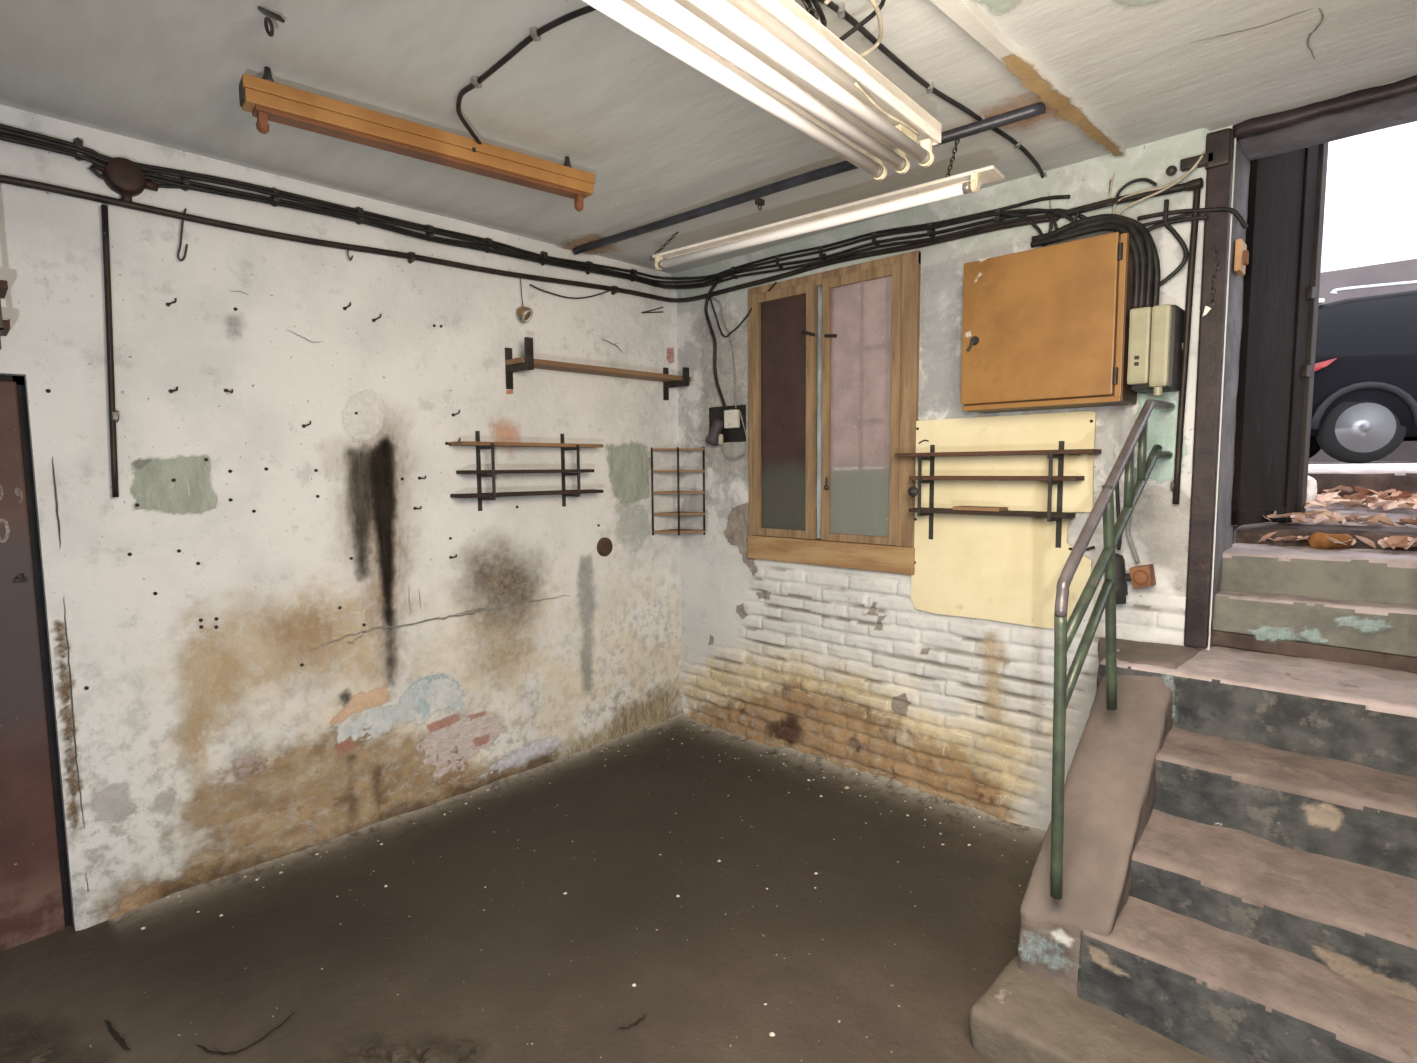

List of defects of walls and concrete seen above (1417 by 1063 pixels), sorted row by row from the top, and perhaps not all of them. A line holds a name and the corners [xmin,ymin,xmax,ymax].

peeling [976,0,1018,14]
water stain [474,555,532,659]
spalling [863,602,885,630]
water stain [186,597,395,762]
peeling [331,674,562,781]
water stain [103,664,1017,912]
spalling [1303,804,1343,831]
peeling [1019,930,1073,969]
spalling [1090,947,1128,976]
spalling [1313,945,1417,1002]
crack [104,1020,131,1050]
crack [196,1010,298,1055]